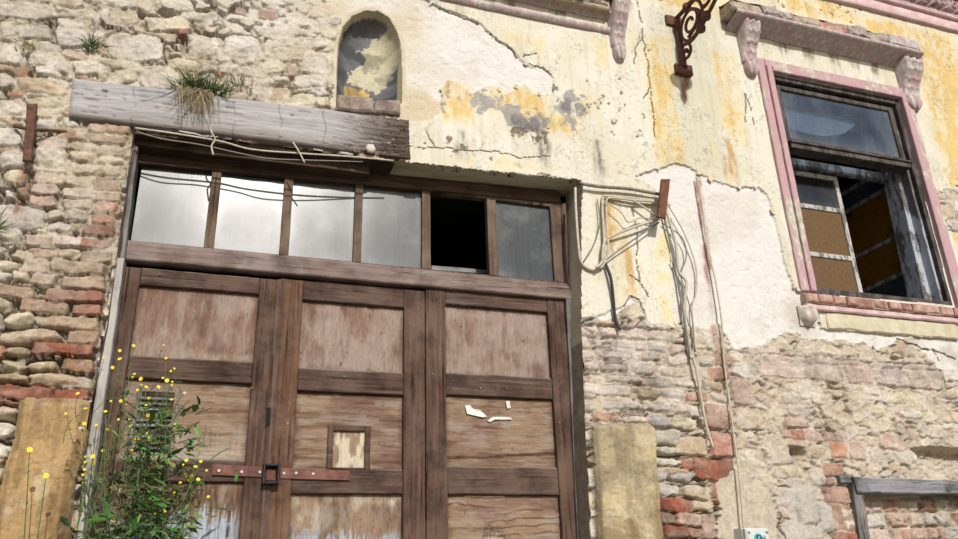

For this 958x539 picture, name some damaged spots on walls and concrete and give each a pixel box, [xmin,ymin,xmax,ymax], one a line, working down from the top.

flaking render [306,0,631,146]
crack [422,0,555,91]
crack [633,0,656,138]
crack [410,130,551,159]
flaking render [579,0,958,539]